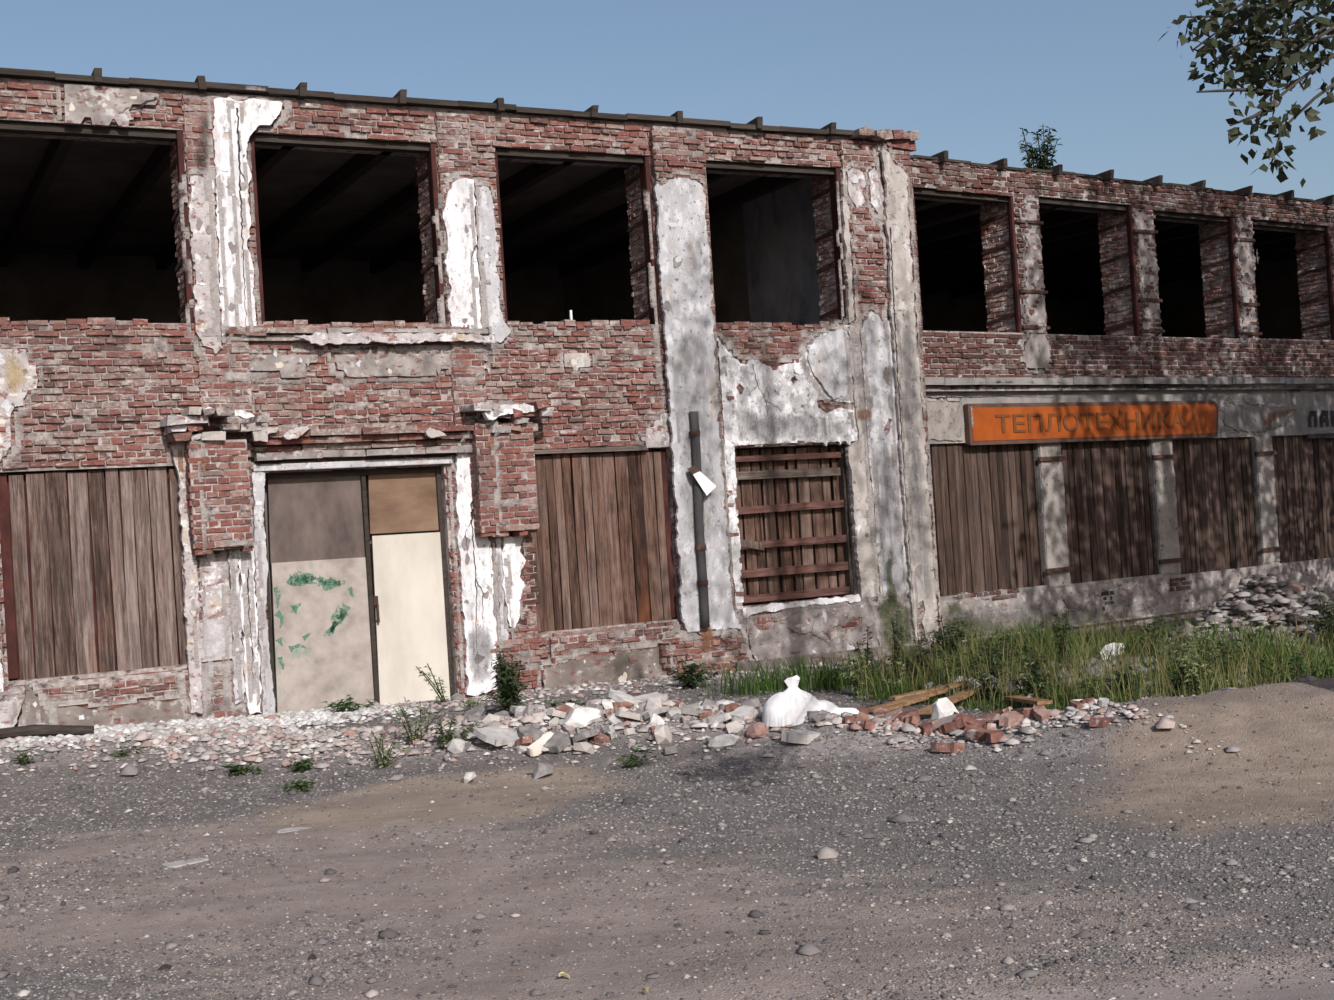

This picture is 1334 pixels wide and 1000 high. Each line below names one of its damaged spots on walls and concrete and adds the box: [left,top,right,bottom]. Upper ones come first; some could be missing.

peeling [0,82,1023,758]